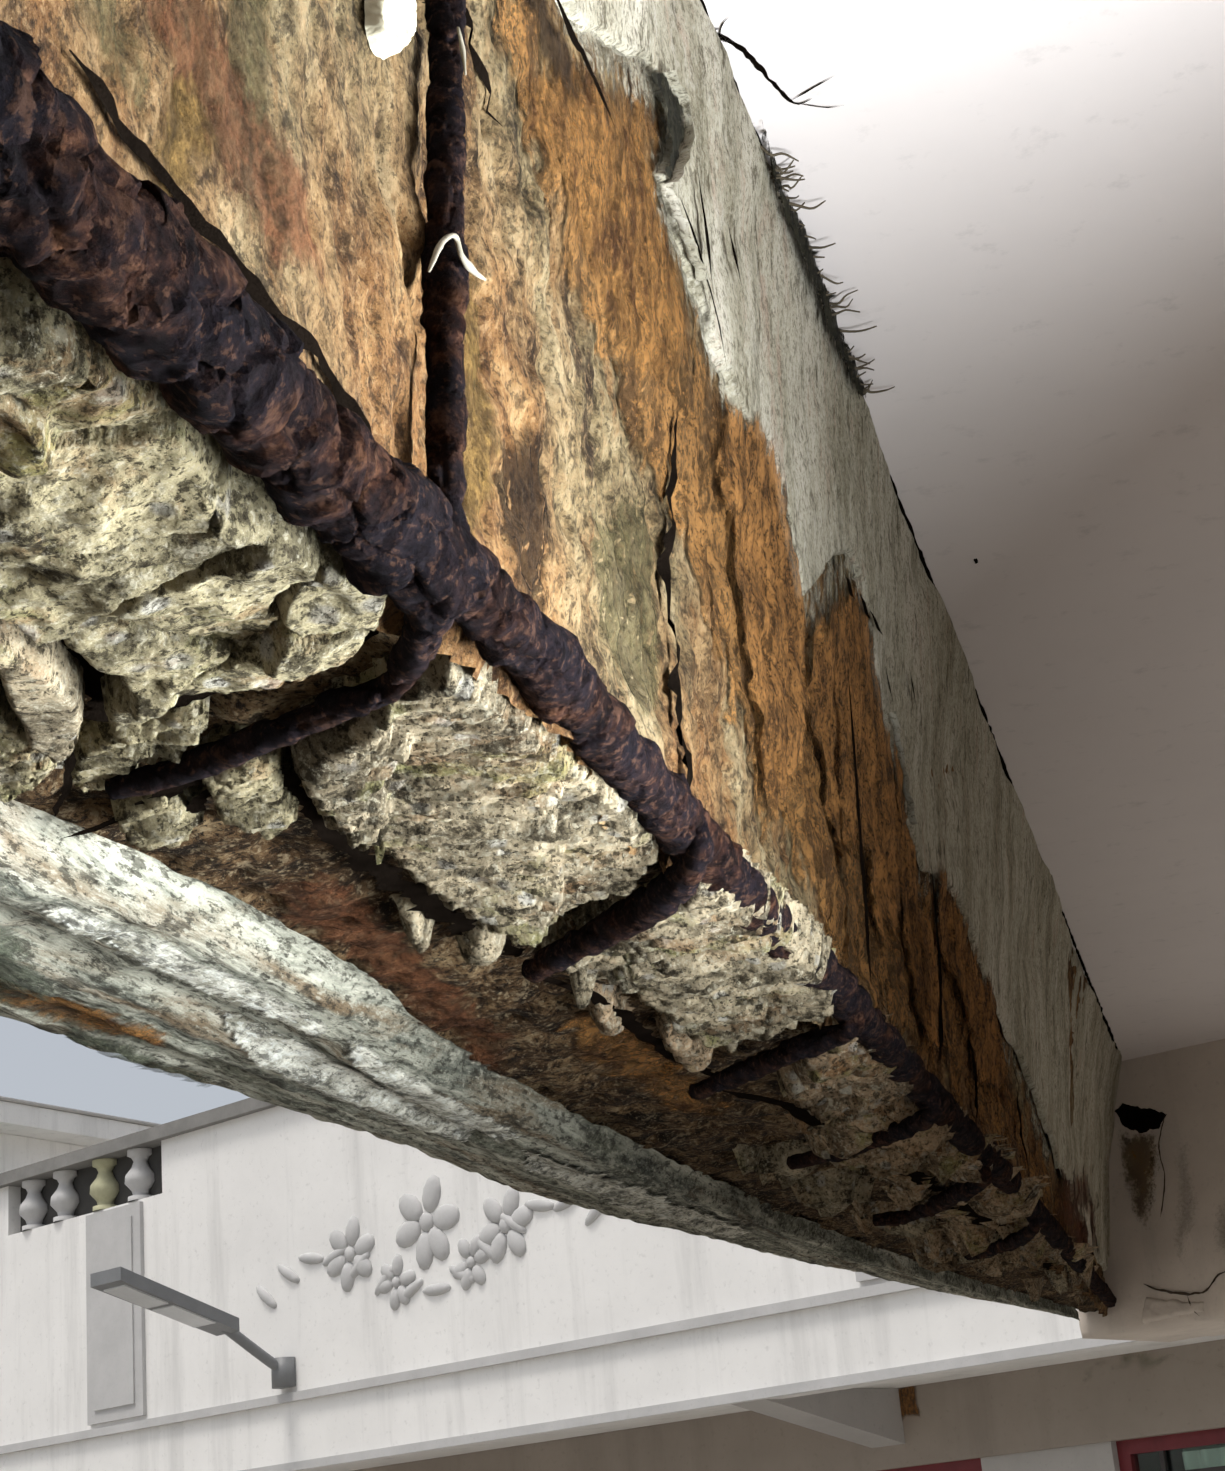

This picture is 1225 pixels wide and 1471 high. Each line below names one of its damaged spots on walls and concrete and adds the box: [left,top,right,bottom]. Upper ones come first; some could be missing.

crack [69,48,372,433]
spalling [0,257,660,966]
rust [462,255,501,533]
crack [656,395,693,786]
crack [679,195,727,366]
crack [700,0,843,155]
rust [492,0,1098,1264]
peeling [555,0,1167,1305]
crack [890,475,935,586]
rust [0,984,167,1047]
rust [279,874,514,1069]
peeling [38,907,758,1238]